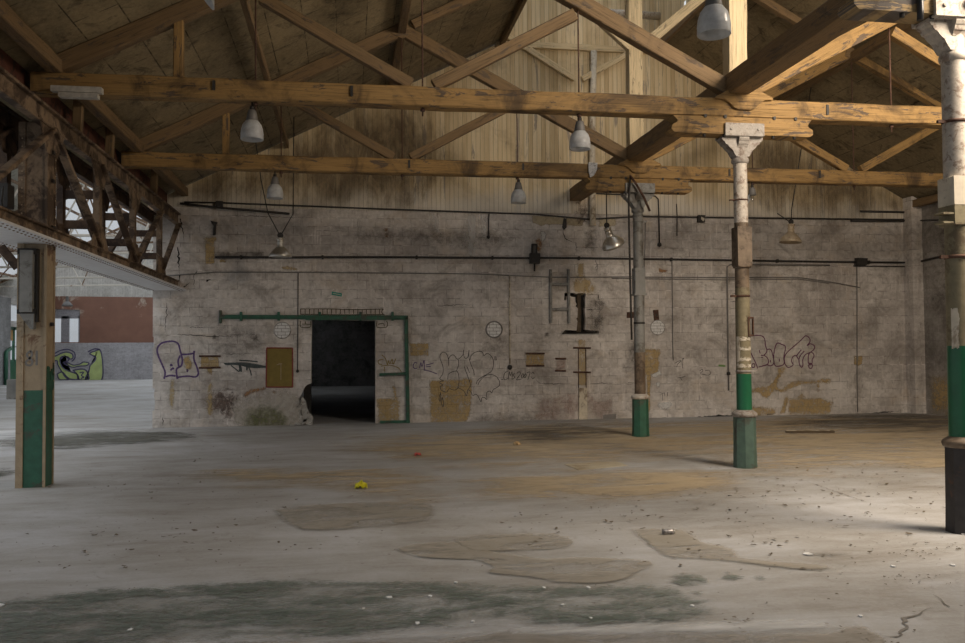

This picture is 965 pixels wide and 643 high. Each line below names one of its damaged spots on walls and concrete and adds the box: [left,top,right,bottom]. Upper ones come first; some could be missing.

peeling [951,308,960,349]
peeling [737,336,751,368]
crack [879,594,950,637]